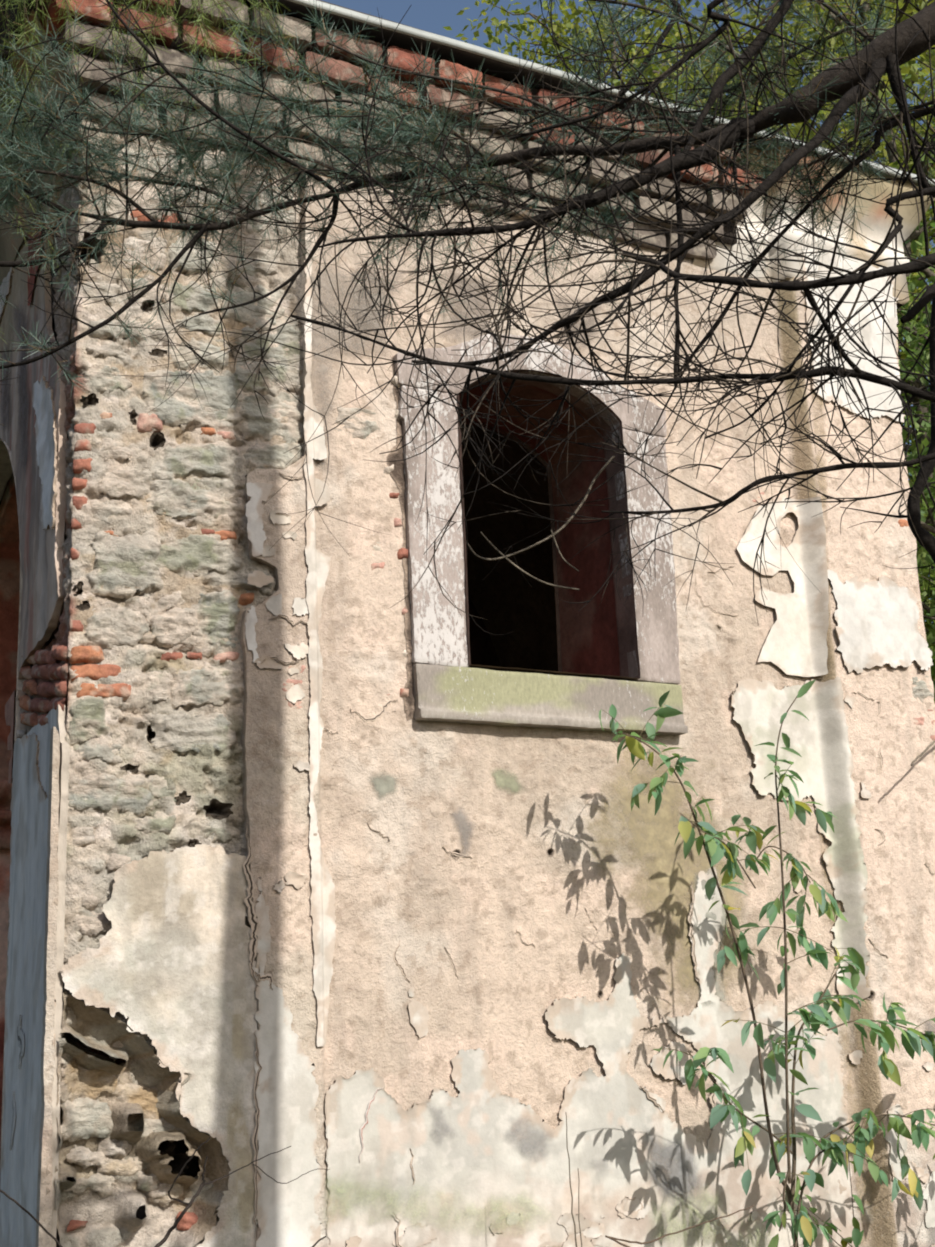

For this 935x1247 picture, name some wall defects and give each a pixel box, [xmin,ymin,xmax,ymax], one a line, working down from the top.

spalling [0,115,336,1247]
flaking render [333,406,380,439]
spalling [371,355,415,720]
peeling [729,492,935,1003]
peeling [324,867,854,1247]
peeling [847,1050,863,1064]